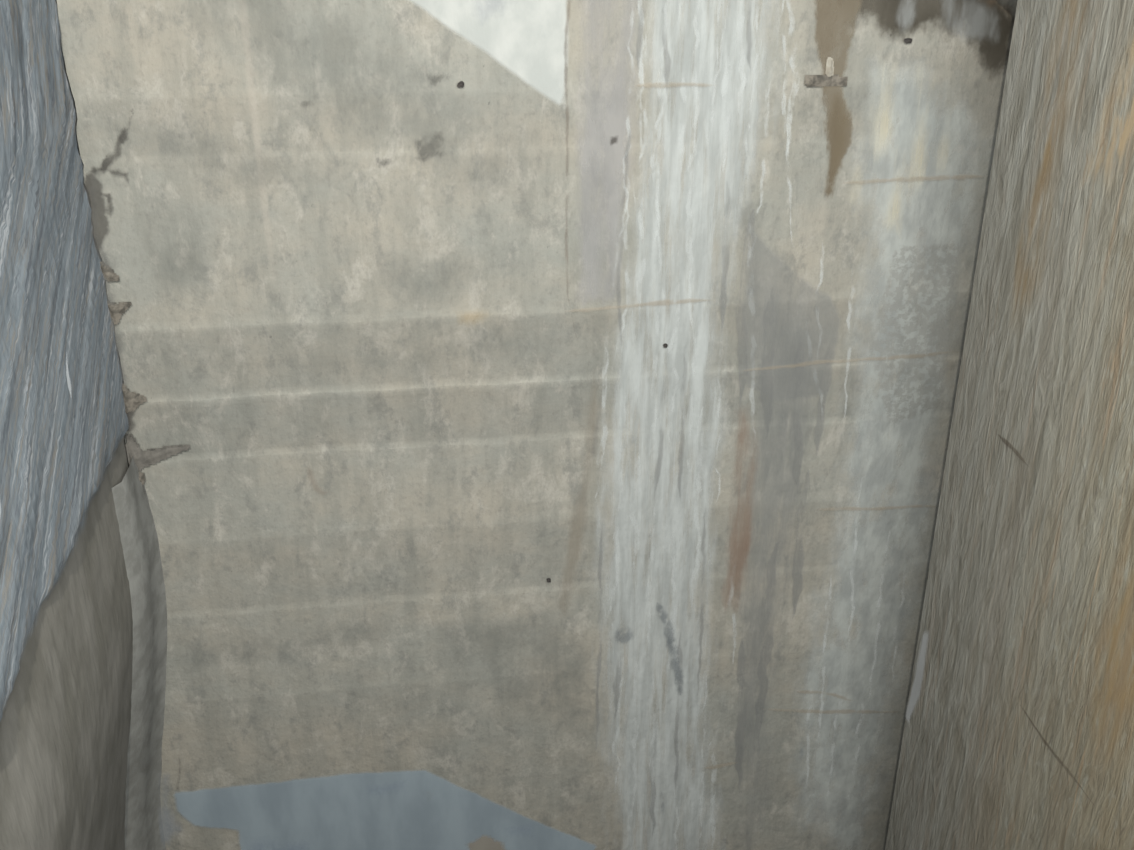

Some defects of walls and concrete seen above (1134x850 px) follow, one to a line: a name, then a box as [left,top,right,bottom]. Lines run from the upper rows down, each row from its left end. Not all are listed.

spalling [804,57,848,87]
spalling [100,261,120,282]
spalling [107,301,132,325]
spalling [122,383,147,414]
water stain [609,0,758,850]
spalling [125,434,190,471]